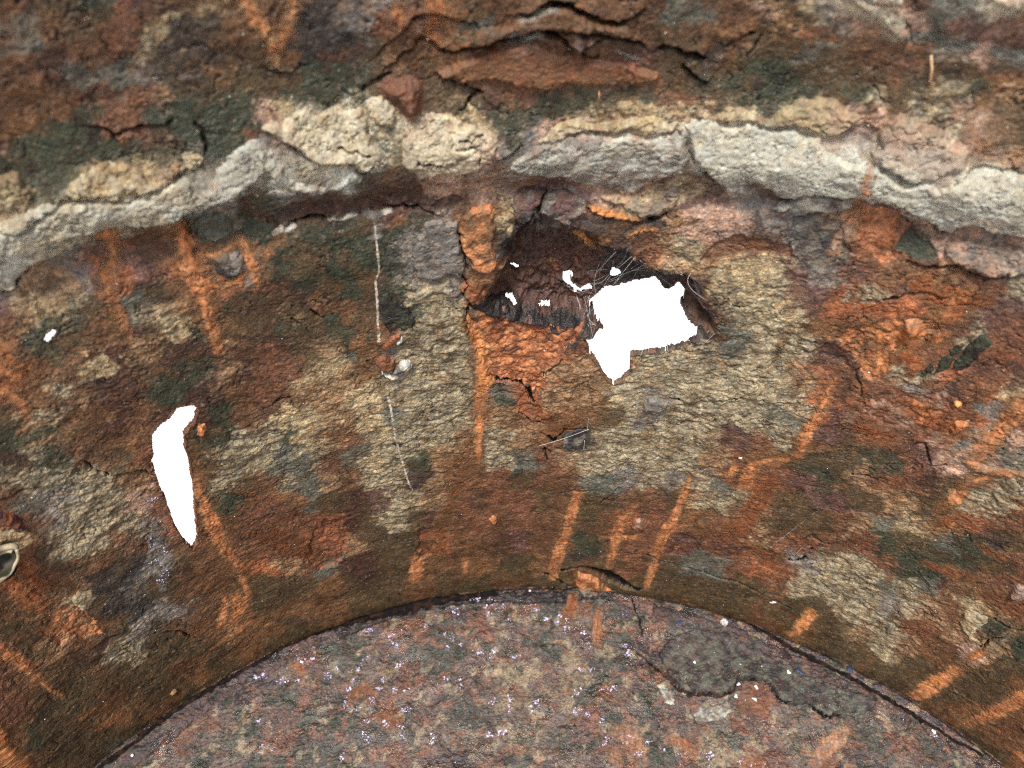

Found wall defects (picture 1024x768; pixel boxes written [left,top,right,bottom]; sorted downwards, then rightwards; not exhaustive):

crack [83,119,208,150]
peeling [0,95,462,291]
crack [362,14,513,111]
peeling [402,112,499,179]
crack [519,0,707,85]
peeling [510,97,1024,278]
corrosion [168,221,260,355]
spalling [466,218,616,424]
corrosion [193,480,251,645]
corrosion [547,474,692,618]
crack [544,565,841,719]
corrosion [908,665,961,700]